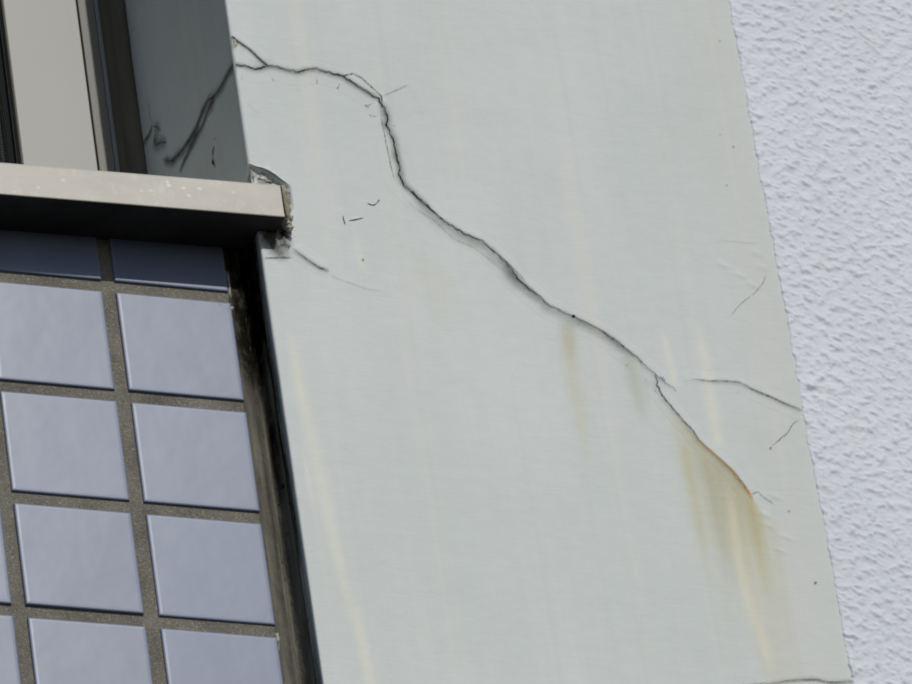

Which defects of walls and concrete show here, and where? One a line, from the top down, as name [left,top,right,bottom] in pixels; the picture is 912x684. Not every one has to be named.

damp [224,238,299,566]
spalling [247,163,292,204]
crack [143,32,802,502]